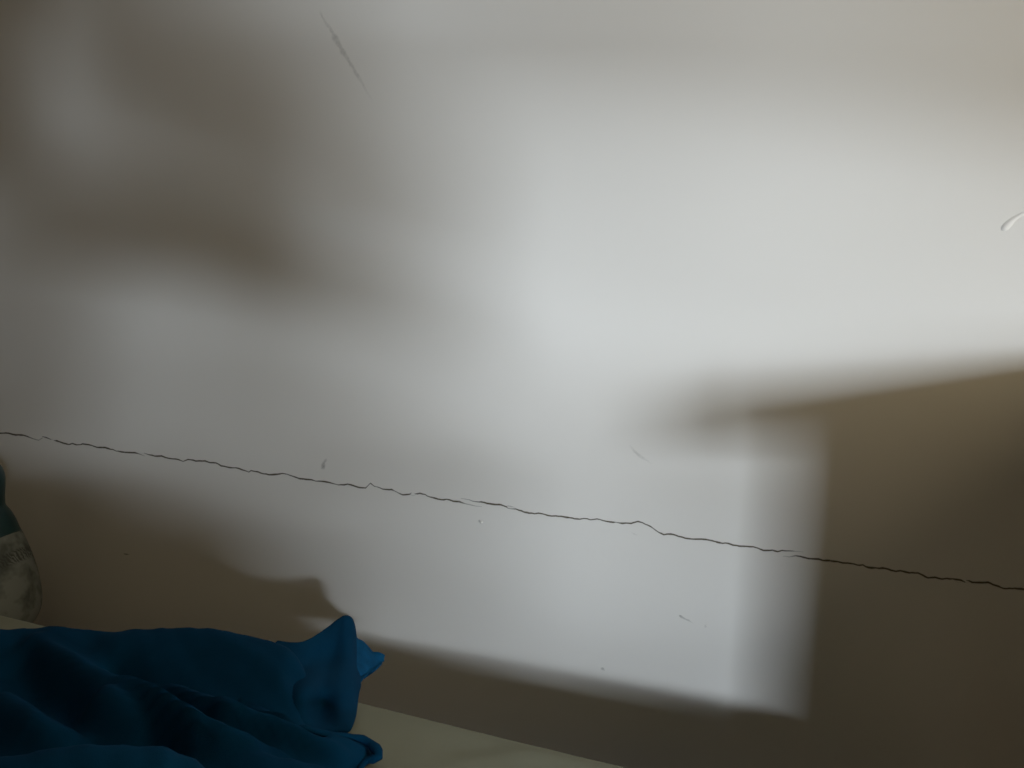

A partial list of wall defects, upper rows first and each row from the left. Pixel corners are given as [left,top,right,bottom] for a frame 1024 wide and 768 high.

crack [0,432,1024,590]